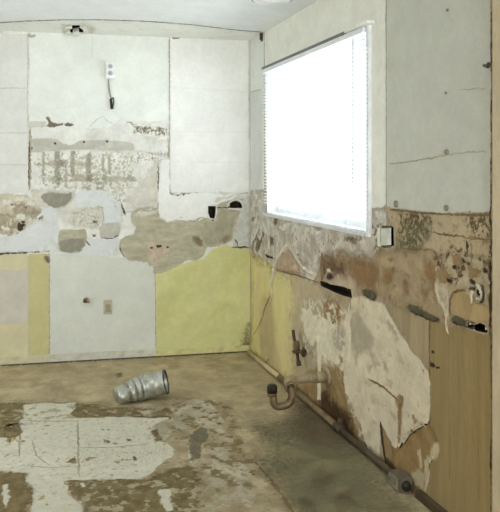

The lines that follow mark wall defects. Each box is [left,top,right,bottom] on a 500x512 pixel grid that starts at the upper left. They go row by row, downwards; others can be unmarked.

crack [487,0,495,71]
flaking render [27,117,74,128]
flaking render [30,137,135,152]
flaking render [126,121,168,142]
flaking render [0,189,76,237]
flaking render [57,229,90,254]
damp [395,210,435,256]
crack [386,87,492,509]
peeling [99,156,493,492]
damp [243,388,429,512]